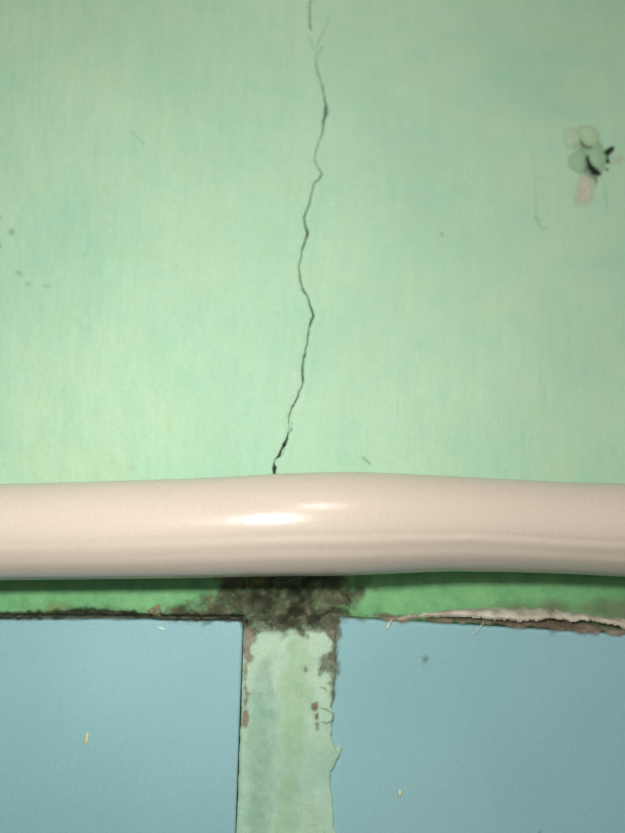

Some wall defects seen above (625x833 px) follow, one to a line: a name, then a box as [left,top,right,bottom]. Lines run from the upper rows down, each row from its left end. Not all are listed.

crack [272,87,330,474]
leakage [169,576,364,698]
peeling [385,607,625,630]